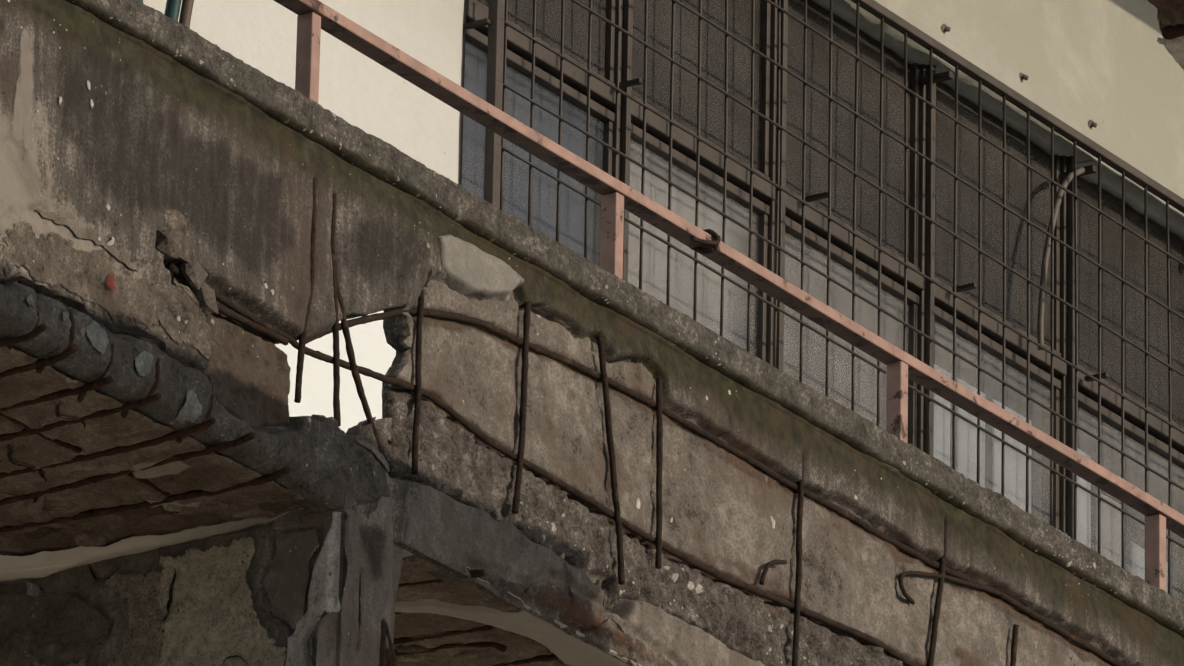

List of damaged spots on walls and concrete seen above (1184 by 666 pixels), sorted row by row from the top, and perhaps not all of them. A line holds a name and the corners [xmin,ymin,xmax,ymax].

spalling [1148,0,1184,45]
damp [10,28,34,150]
spalling [0,177,1126,666]